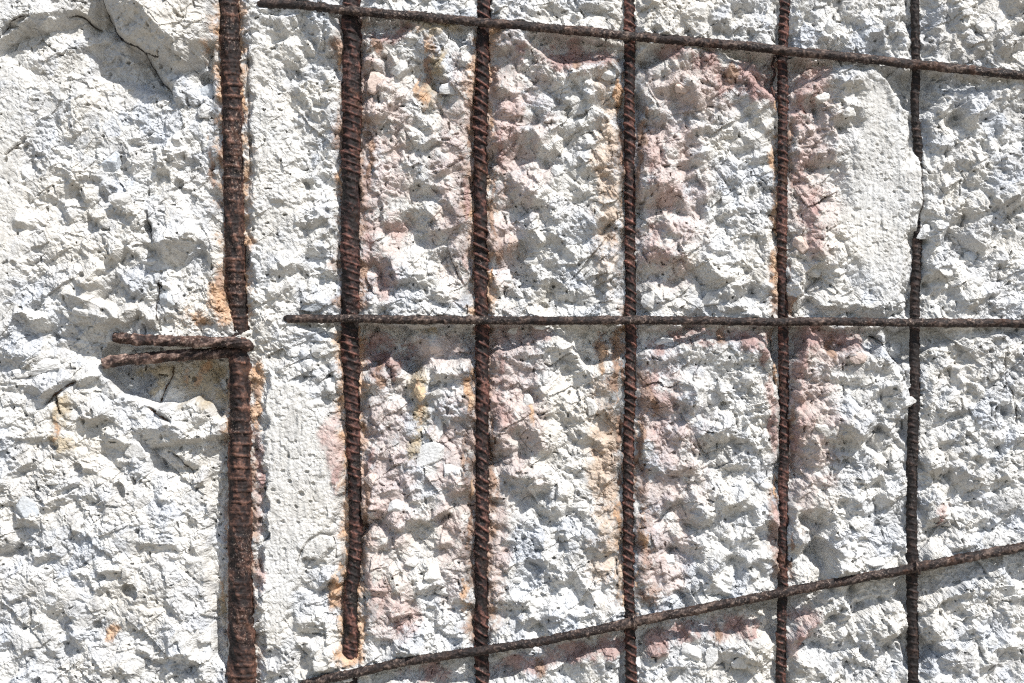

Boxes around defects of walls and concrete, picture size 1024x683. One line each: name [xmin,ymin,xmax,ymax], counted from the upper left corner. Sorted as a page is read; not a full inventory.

crack [75,1,173,96]
rust [191,264,232,325]
rust [249,362,266,540]
rust [318,327,422,667]
rust [358,21,414,311]
rust [459,27,522,316]
rust [460,327,551,642]
spalling [239,0,1024,683]
rust [588,306,676,611]
rust [547,38,777,249]
rust [648,326,861,461]
rust [497,634,625,677]